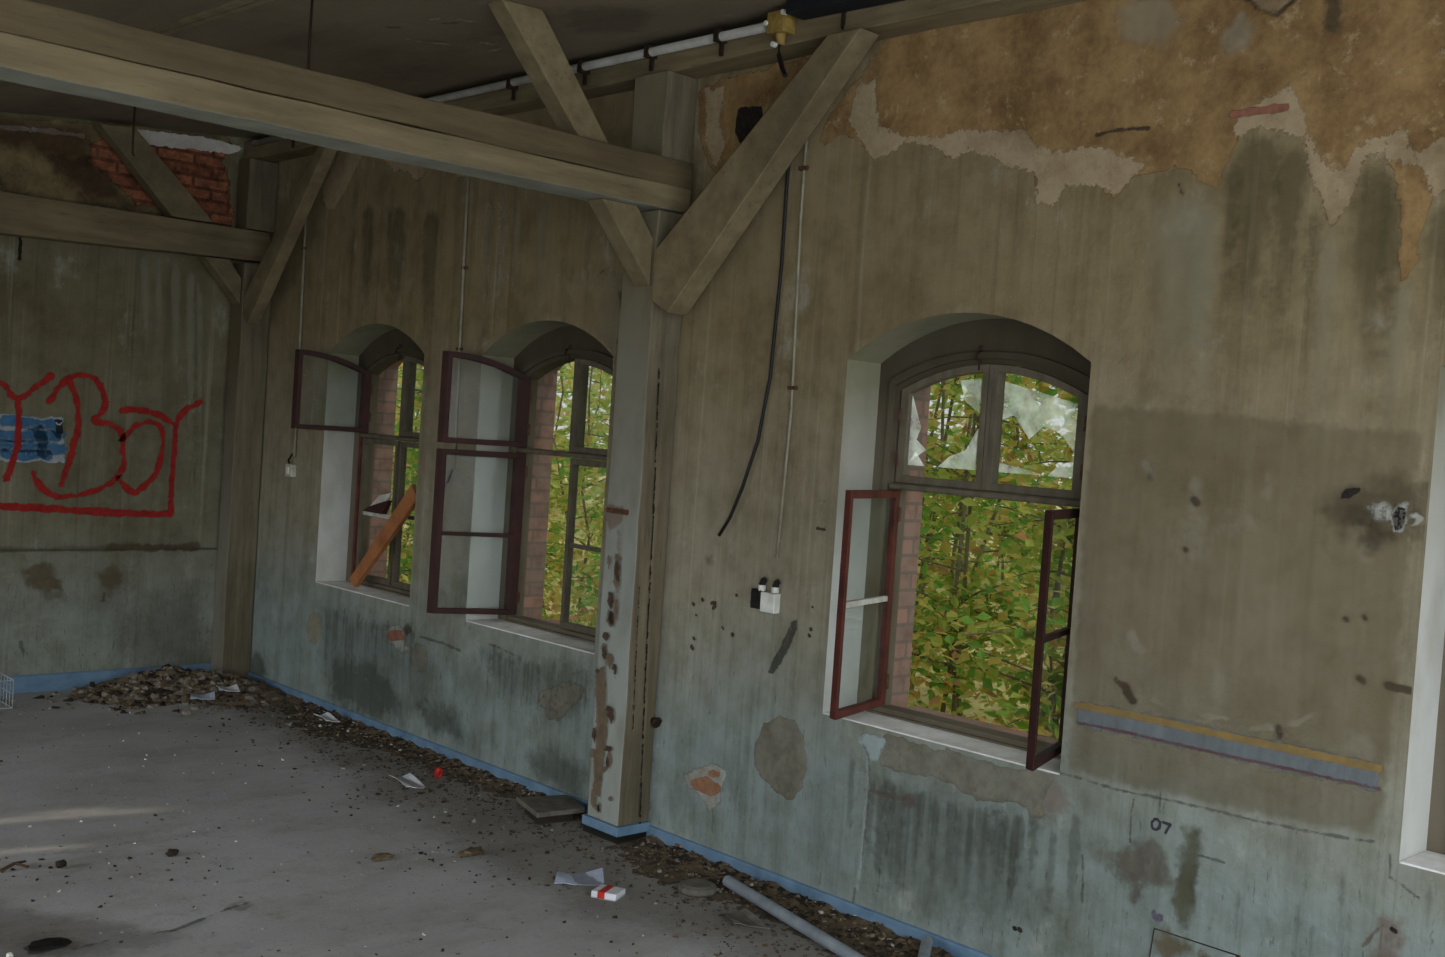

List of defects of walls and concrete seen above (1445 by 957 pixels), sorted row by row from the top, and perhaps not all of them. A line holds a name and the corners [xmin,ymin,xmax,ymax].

flaking render [0,116,234,227]
peeling [698,57,809,174]
peeling [820,0,1445,281]
peeling [590,554,621,813]
spalling [684,764,726,811]
leakage [1119,830,1199,923]